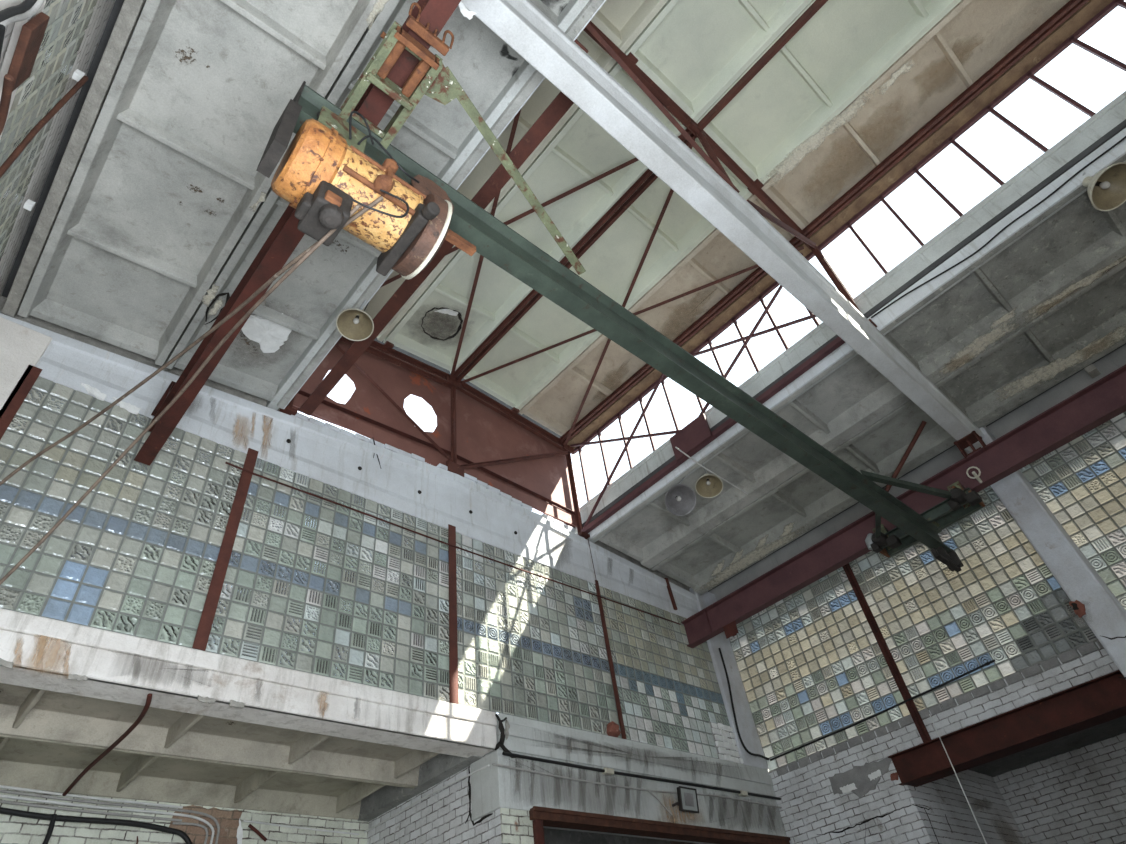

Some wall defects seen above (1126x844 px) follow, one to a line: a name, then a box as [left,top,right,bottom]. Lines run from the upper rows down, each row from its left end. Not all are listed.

peeling [240,300,292,353]
rust [15,635,69,672]
peeling [828,758,898,798]
peeling [169,805,243,844]
crack [817,787,953,844]